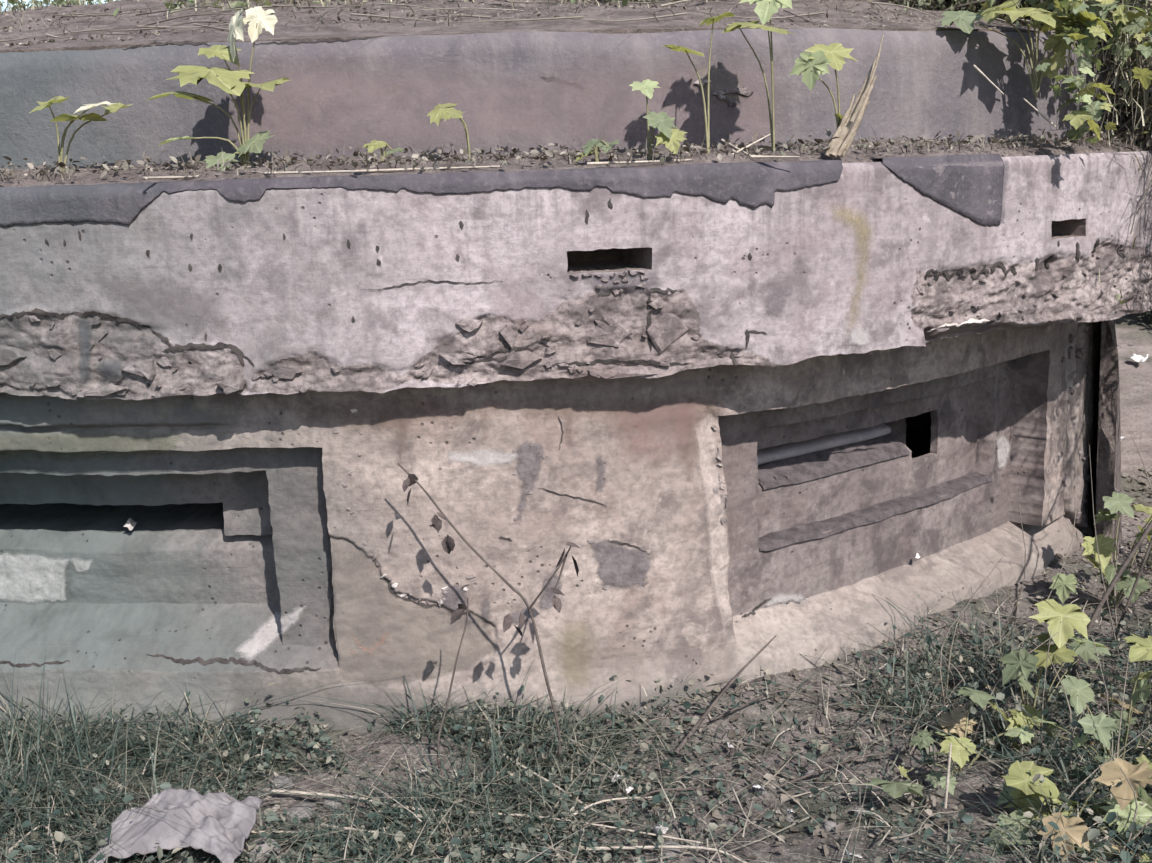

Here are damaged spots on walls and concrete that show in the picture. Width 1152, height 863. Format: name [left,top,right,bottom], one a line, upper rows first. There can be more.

spalling [0,264,781,400]
spalling [911,238,1152,530]
crack [0,660,70,668]
crack [146,653,321,674]